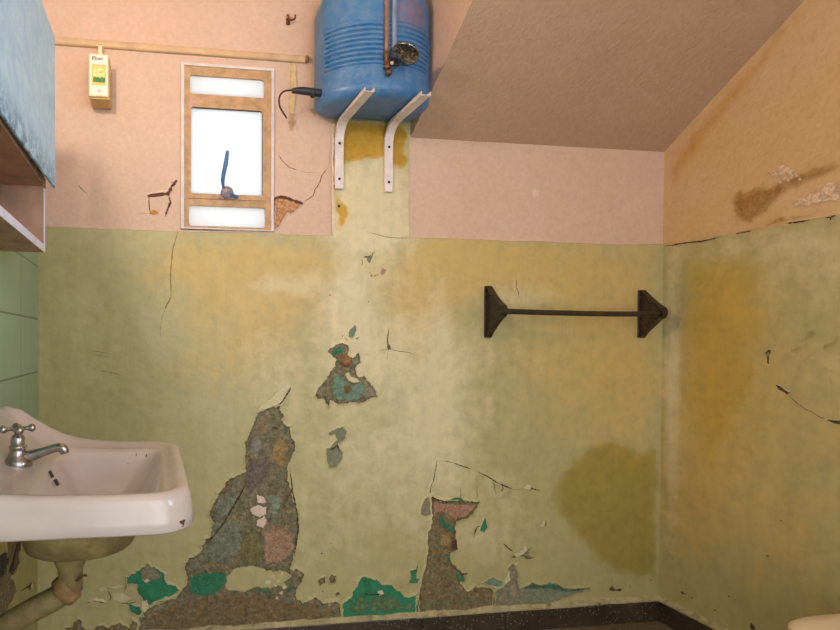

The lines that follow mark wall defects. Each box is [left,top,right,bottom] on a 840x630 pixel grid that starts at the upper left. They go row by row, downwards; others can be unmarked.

crack [141,178,177,216]
crack [160,232,178,337]
peeling [313,323,379,409]
crack [380,329,412,356]
flaking render [62,384,592,630]